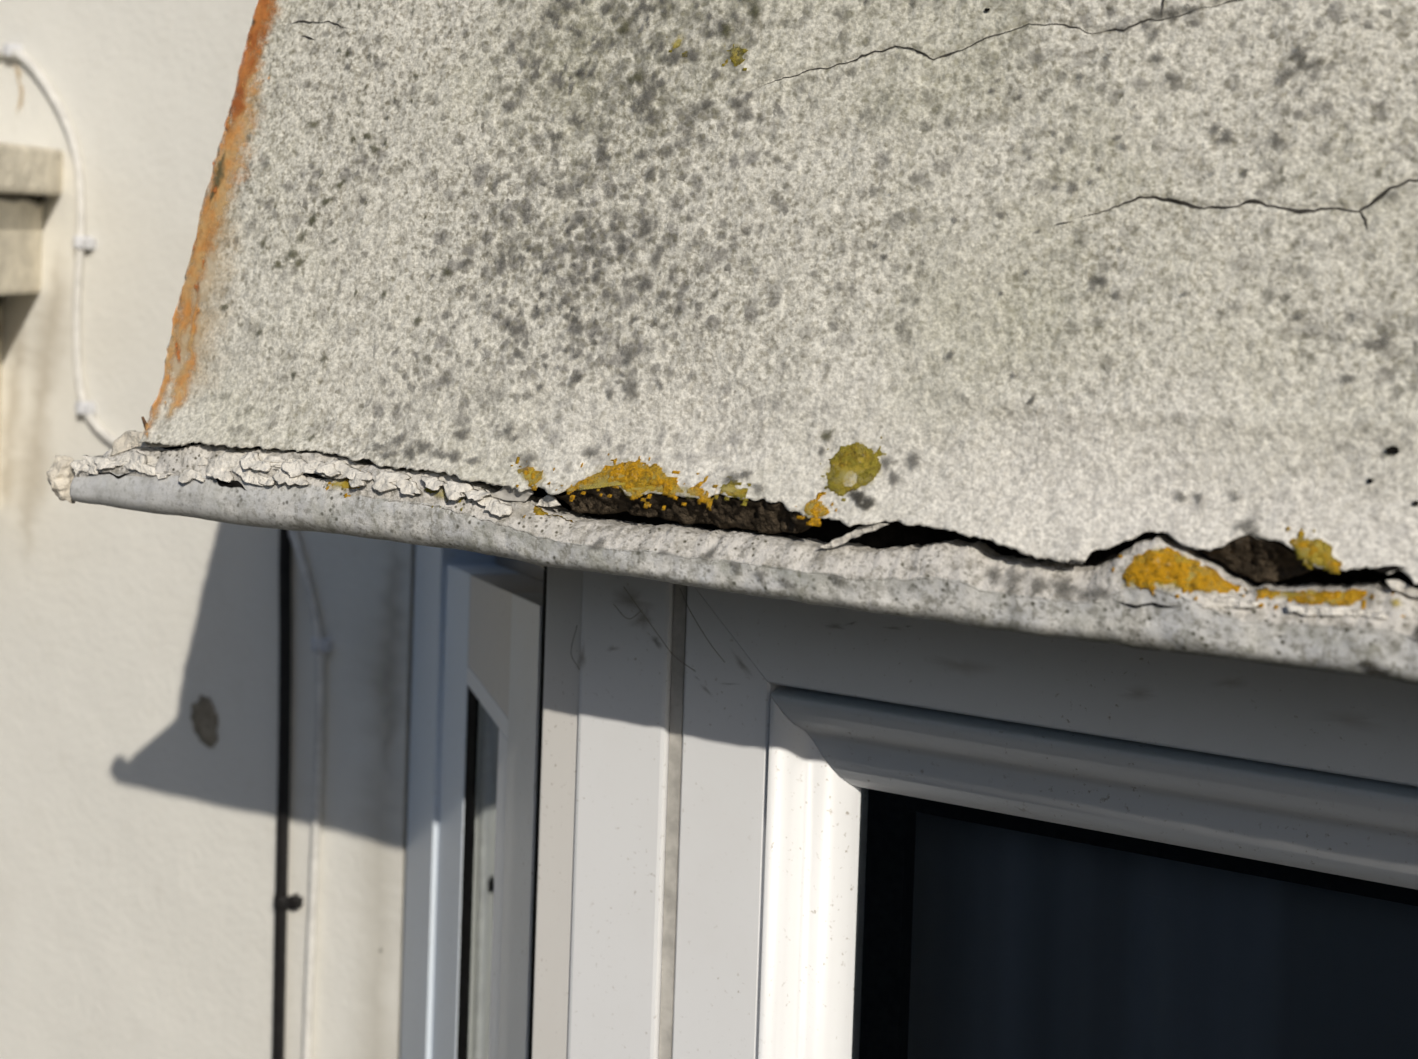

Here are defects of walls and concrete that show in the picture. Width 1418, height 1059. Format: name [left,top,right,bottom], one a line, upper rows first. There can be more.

mould [509,0,697,92]
mould [696,0,760,59]
crack [746,0,1239,93]
corrosion [146,0,275,436]
leakage [274,180,345,267]
crack [1054,179,1418,230]
mould [499,246,597,382]
crack [81,442,202,478]
peeling [70,430,829,534]
crack [532,484,1166,567]
peeling [818,523,888,549]
crack [1198,534,1418,589]